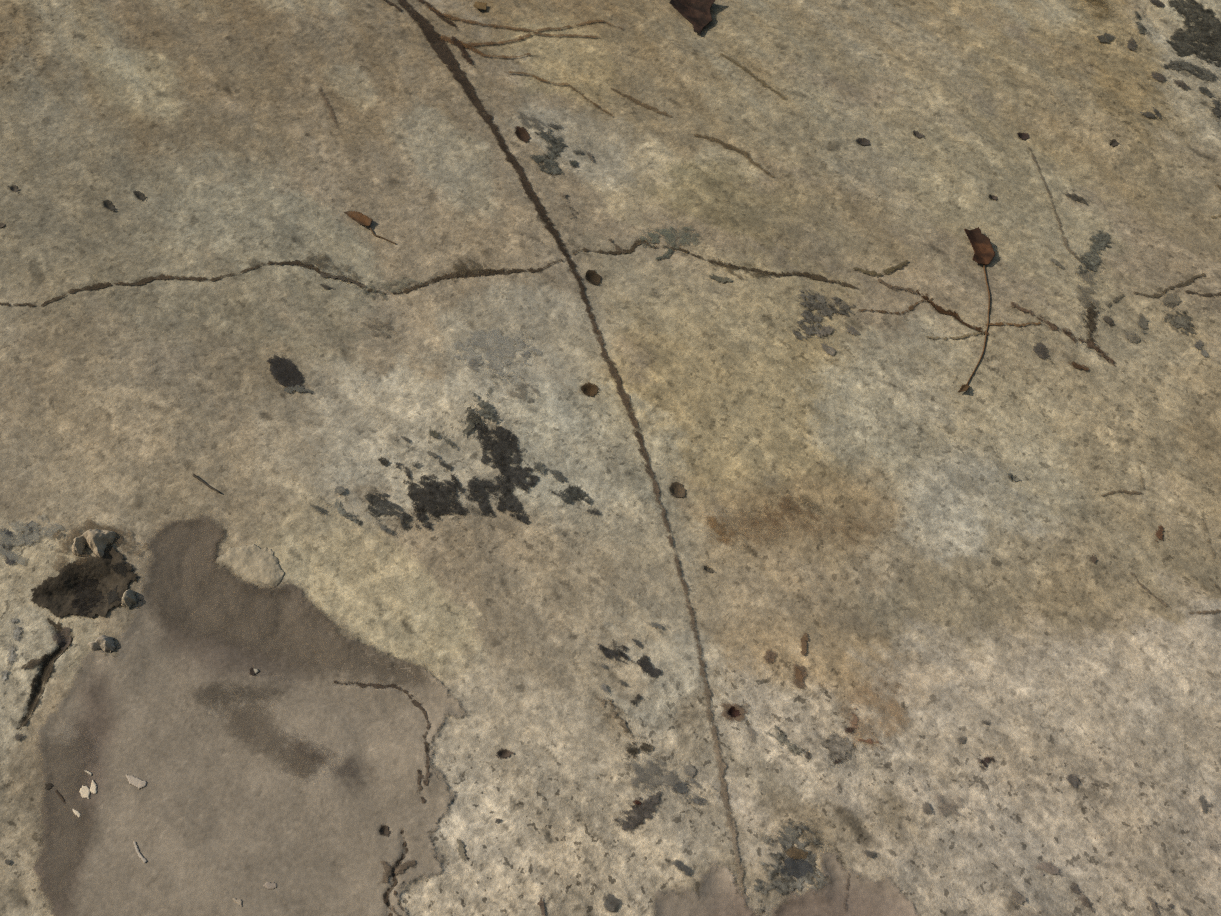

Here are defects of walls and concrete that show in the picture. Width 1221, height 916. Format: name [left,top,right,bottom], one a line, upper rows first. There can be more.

leakage [1097,11,1151,50]
leakage [1150,0,1221,125]
crack [1028,147,1080,261]
crack [853,260,1041,340]
crack [0,0,859,916]
crack [1101,463,1144,496]
spalling [31,515,467,916]
leakage [595,638,715,833]
leakage [602,893,621,911]
leakage [672,859,691,876]
leakage [753,819,827,912]
leakage [1071,883,1093,912]